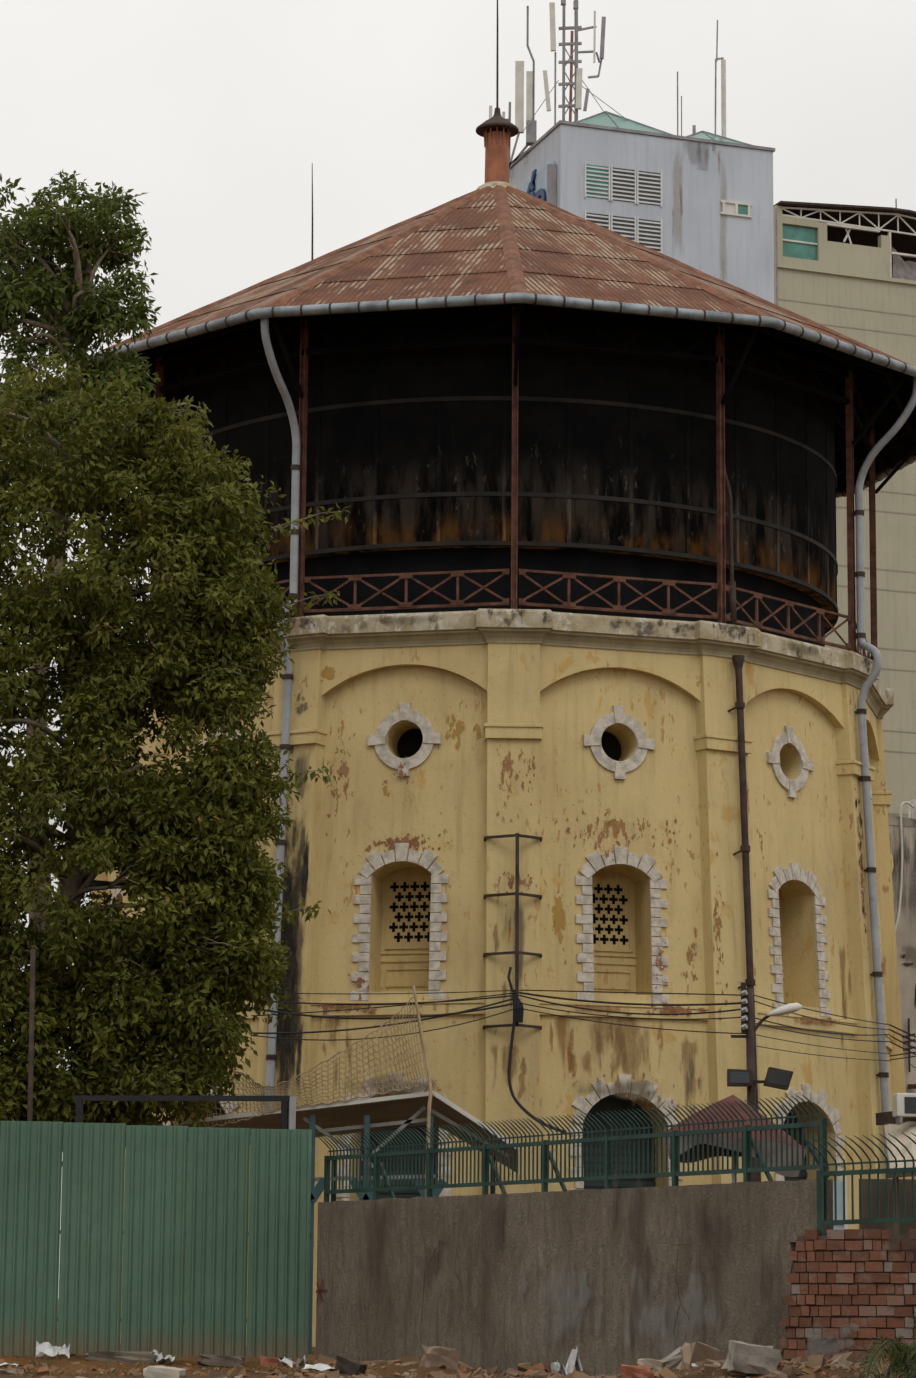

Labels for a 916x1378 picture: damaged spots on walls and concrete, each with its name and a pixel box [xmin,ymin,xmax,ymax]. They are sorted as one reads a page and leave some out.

peeling [438,714,482,750]
peeling [325,729,356,837]
spalling [494,748,536,823]
peeling [365,833,449,852]
peeling [552,810,678,861]
water stain [275,822,309,1094]
water stain [900,948,916,966]